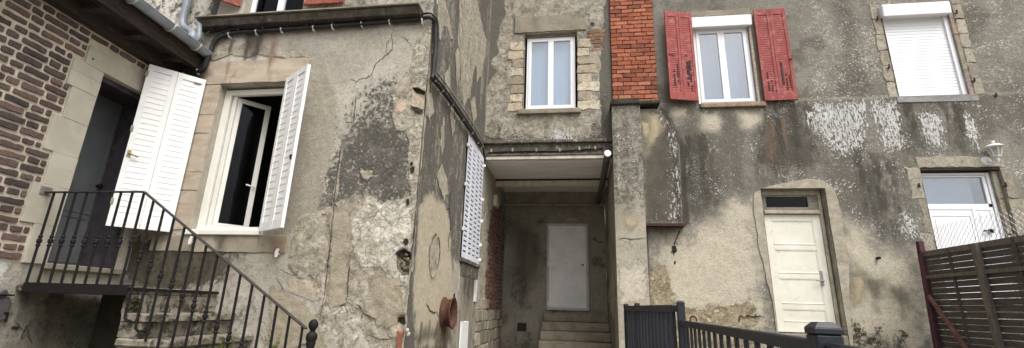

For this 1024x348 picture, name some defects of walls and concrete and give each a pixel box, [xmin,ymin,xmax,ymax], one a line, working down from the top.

crack [277,26,412,340]
peeling [304,0,606,348]
efflorescence [806,97,948,171]
efflorescence [960,109,981,152]